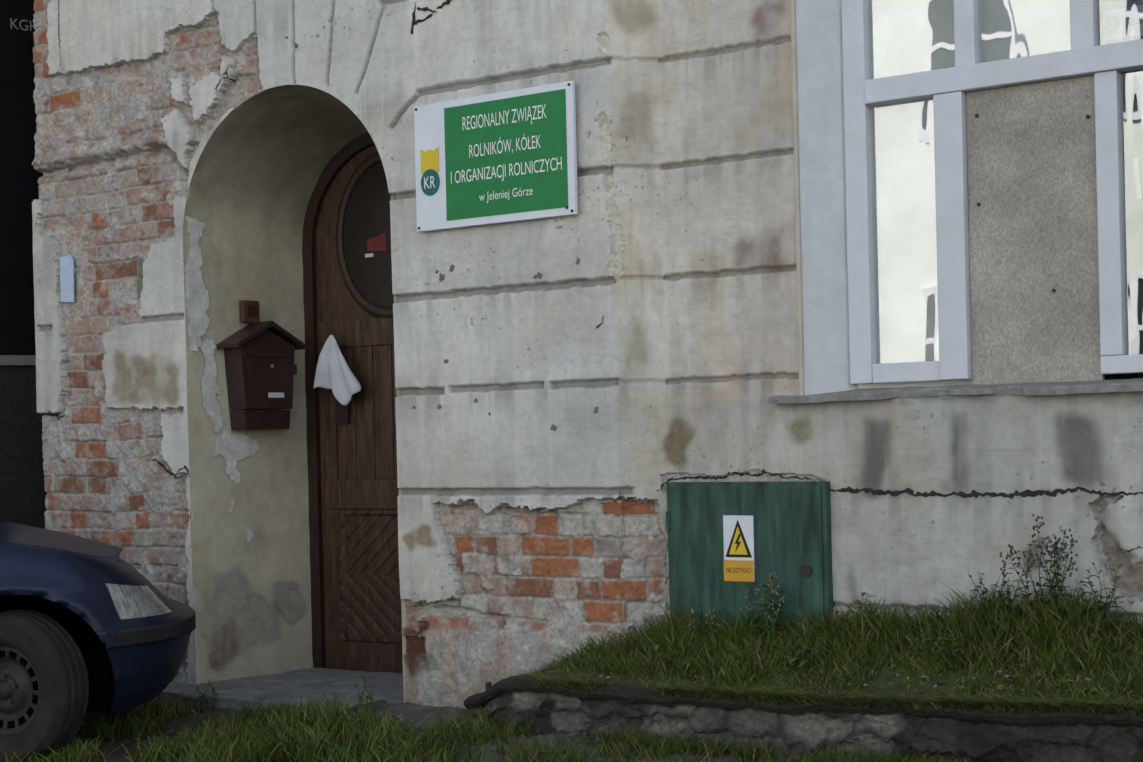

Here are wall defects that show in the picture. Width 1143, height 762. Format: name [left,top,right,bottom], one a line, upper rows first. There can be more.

crack [411,0,451,34]
spalling [33,0,263,606]
water stain [665,420,692,464]
crack [656,469,1143,499]
spalling [402,469,825,708]
spalling [1088,495,1143,606]